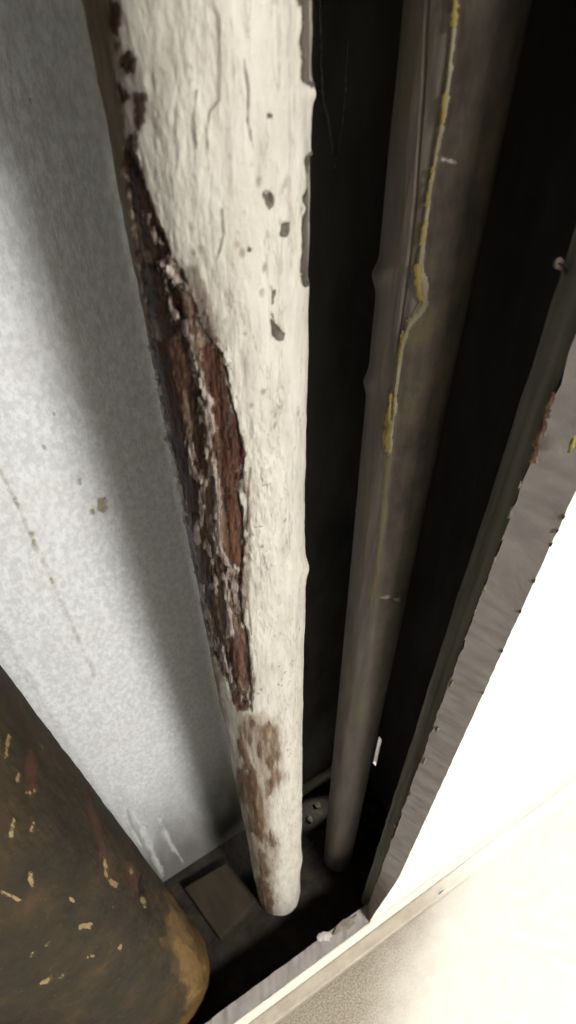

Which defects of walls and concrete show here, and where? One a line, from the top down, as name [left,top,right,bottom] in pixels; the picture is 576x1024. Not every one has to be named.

peeling [263,192,274,209]
peeling [280,187,310,287]
peeling [271,289,285,341]
rust [108,0,281,913]
peeling [103,858,119,888]